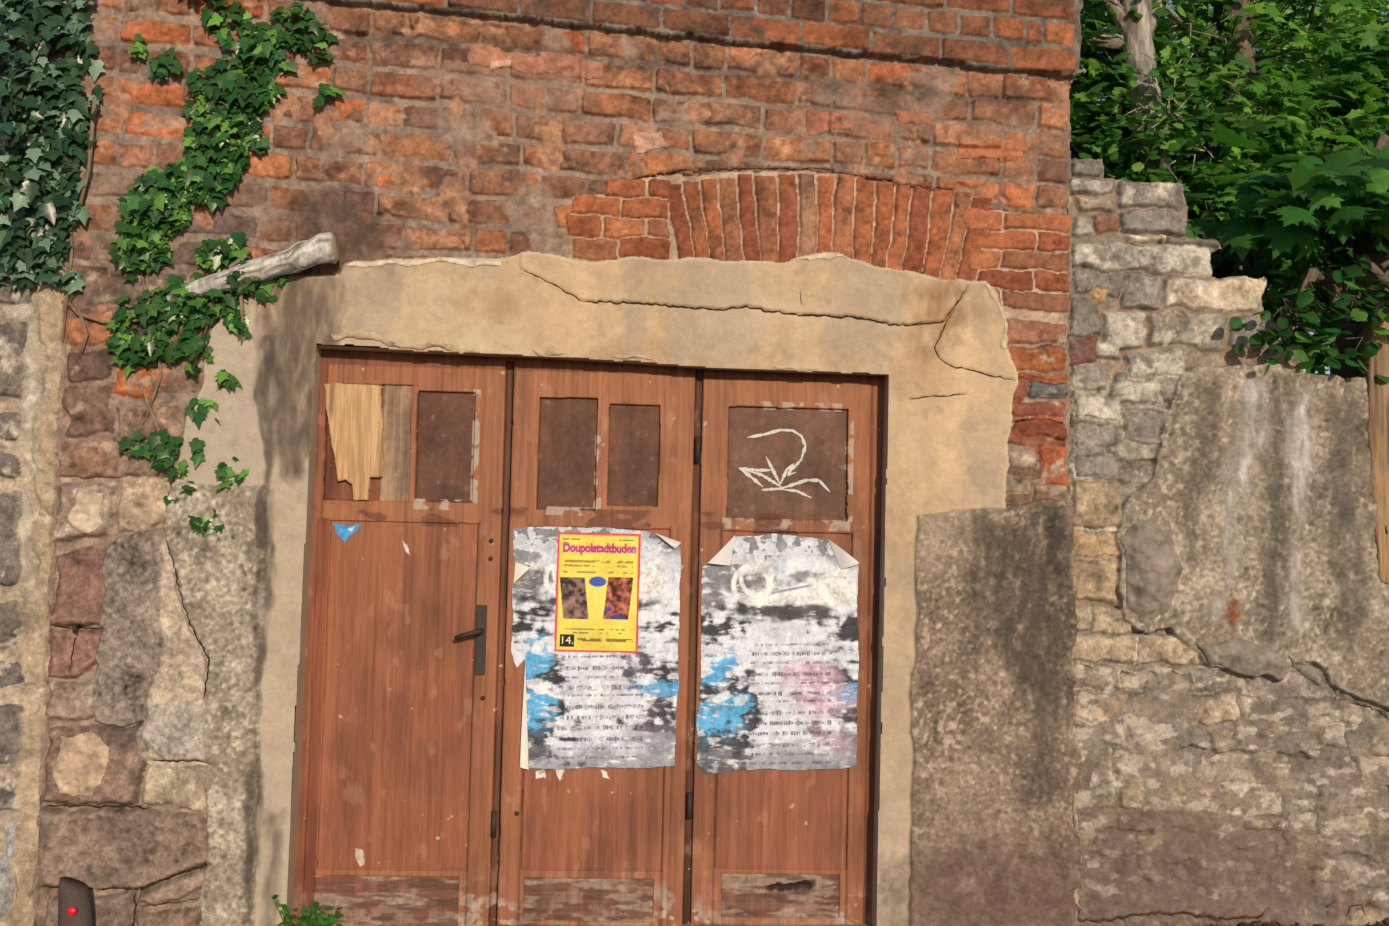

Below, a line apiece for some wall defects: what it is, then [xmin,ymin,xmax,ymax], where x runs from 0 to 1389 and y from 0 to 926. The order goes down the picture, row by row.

crack [520,269,1013,399]
water stain [255,279,334,546]
crack [166,541,210,700]
peeling [1194,638,1381,706]
crack [1077,910,1266,923]